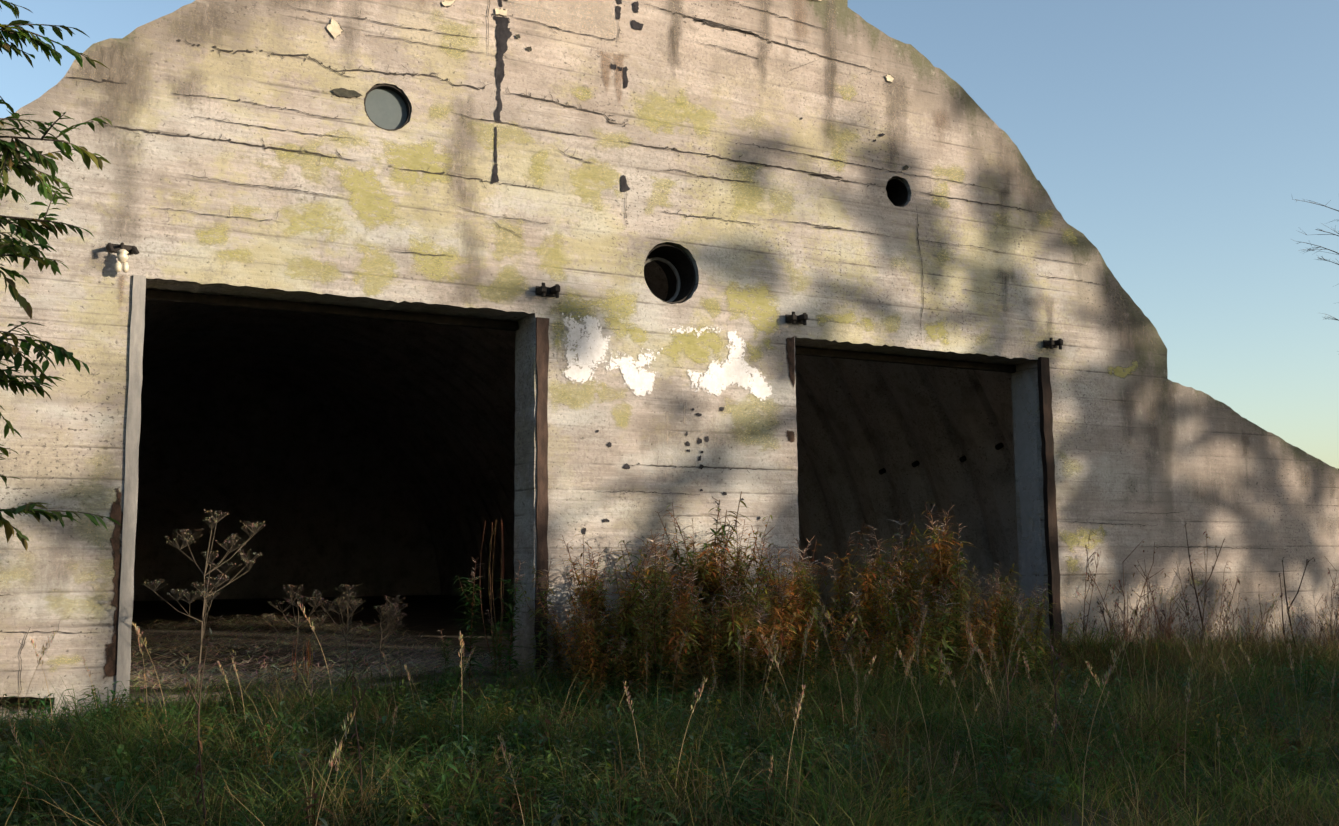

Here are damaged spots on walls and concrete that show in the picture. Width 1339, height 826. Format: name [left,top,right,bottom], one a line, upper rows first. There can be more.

crack [69,77,123,85]
crack [91,93,356,222]
crack [178,0,1036,344]
peeling [562,311,663,399]
peeling [668,325,772,411]